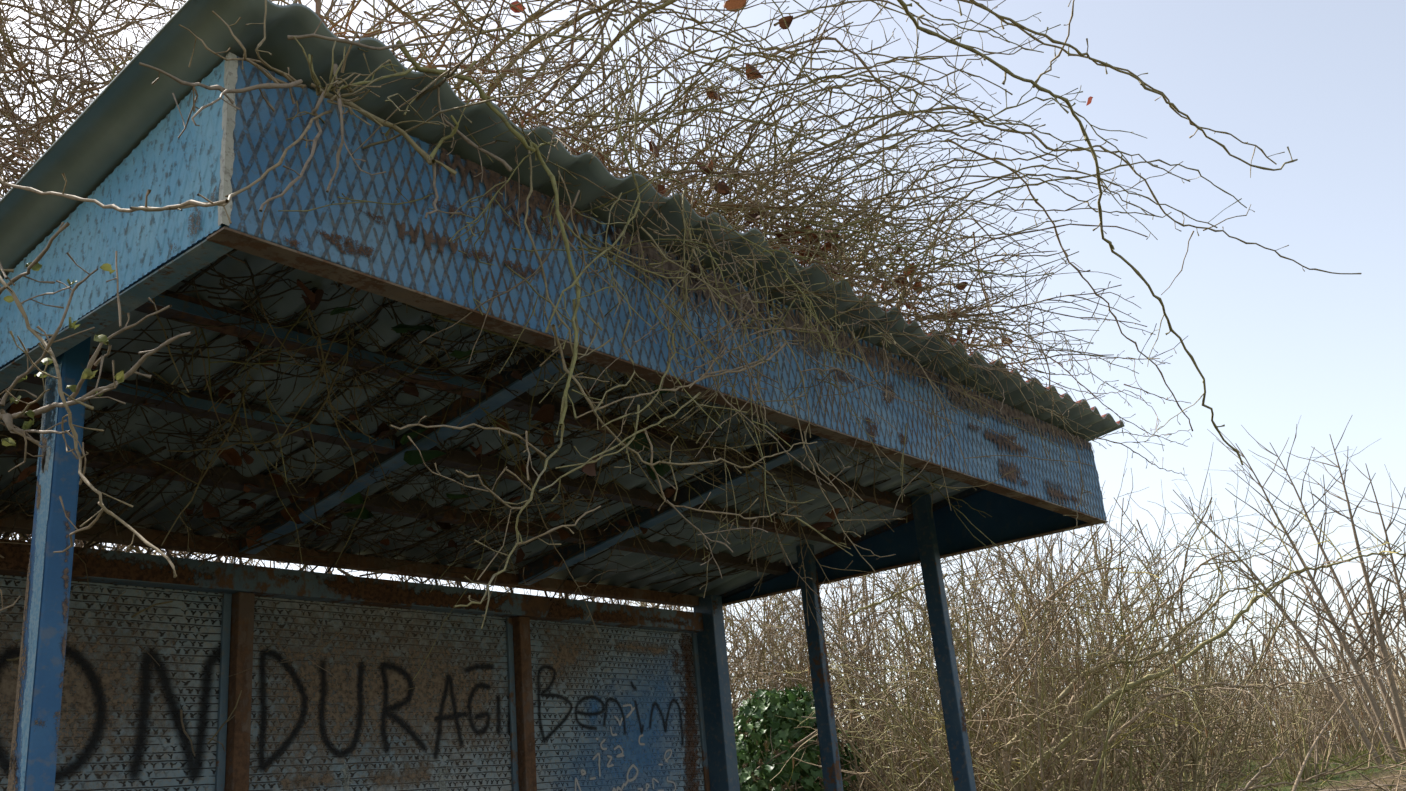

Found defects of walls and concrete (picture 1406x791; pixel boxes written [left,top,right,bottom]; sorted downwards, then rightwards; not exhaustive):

corrosion [359,208,536,277]
corrosion [431,143,1094,506]
corrosion [0,539,31,571]
corrosion [72,549,215,586]